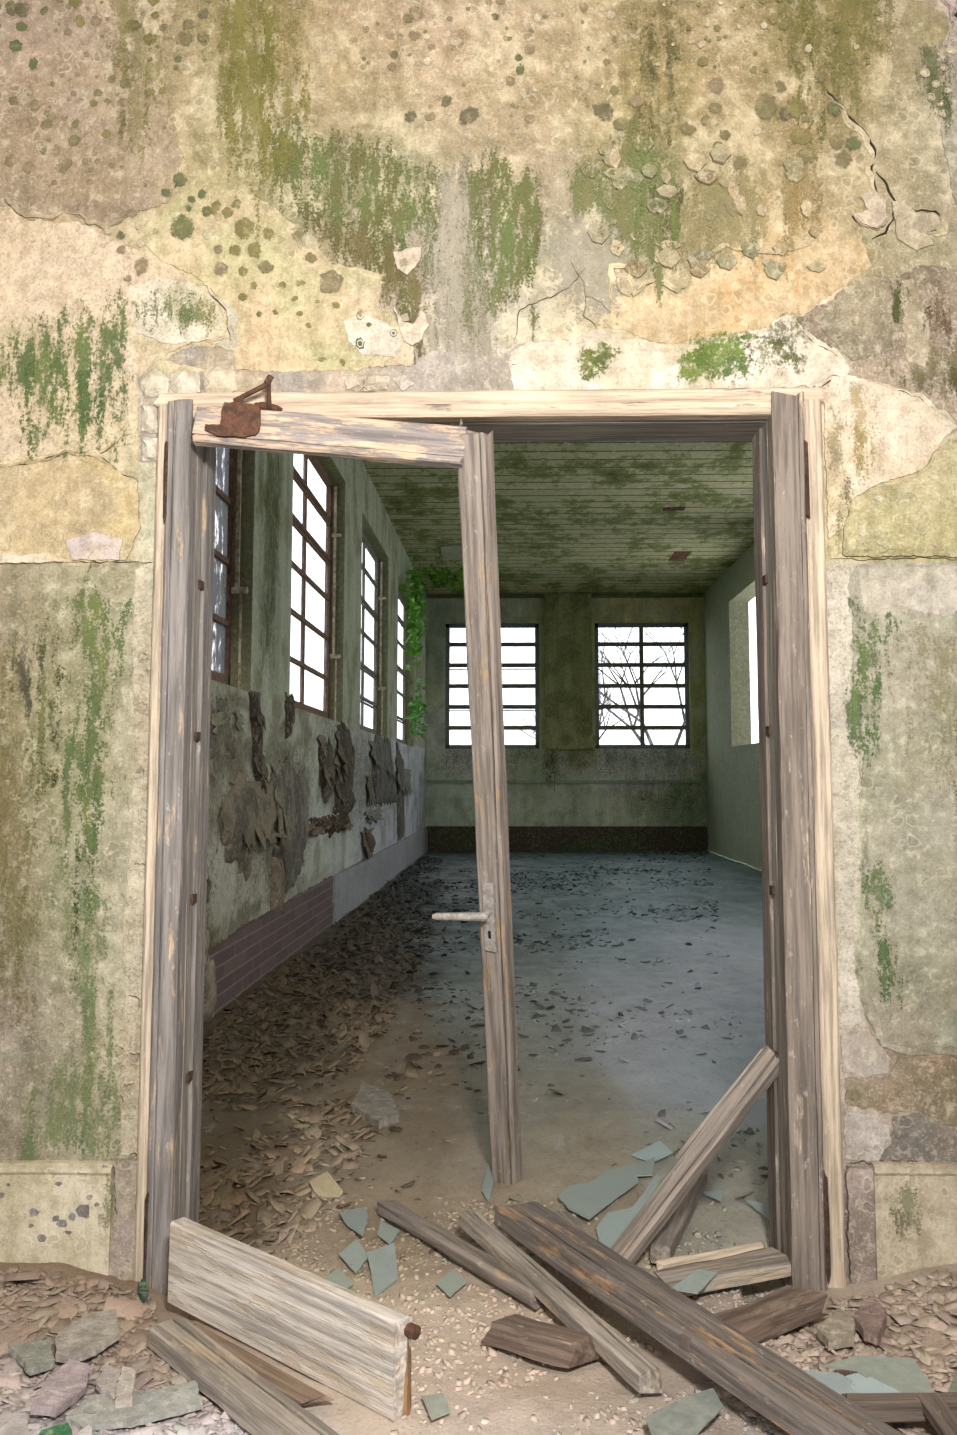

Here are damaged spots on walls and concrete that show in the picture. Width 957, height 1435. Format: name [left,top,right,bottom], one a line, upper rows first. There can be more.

damp [254,13,274,257]
damp [400,153,509,360]
flaking render [0,0,957,564]
crack [823,89,896,239]
damp [22,358,105,467]
damp [858,646,882,755]
damp [2,627,114,1161]
spalling [120,563,154,1156]
flaking render [203,690,413,1024]
damp [877,921,903,1015]
peeling [826,563,957,1285]
spalling [29,1195,100,1242]